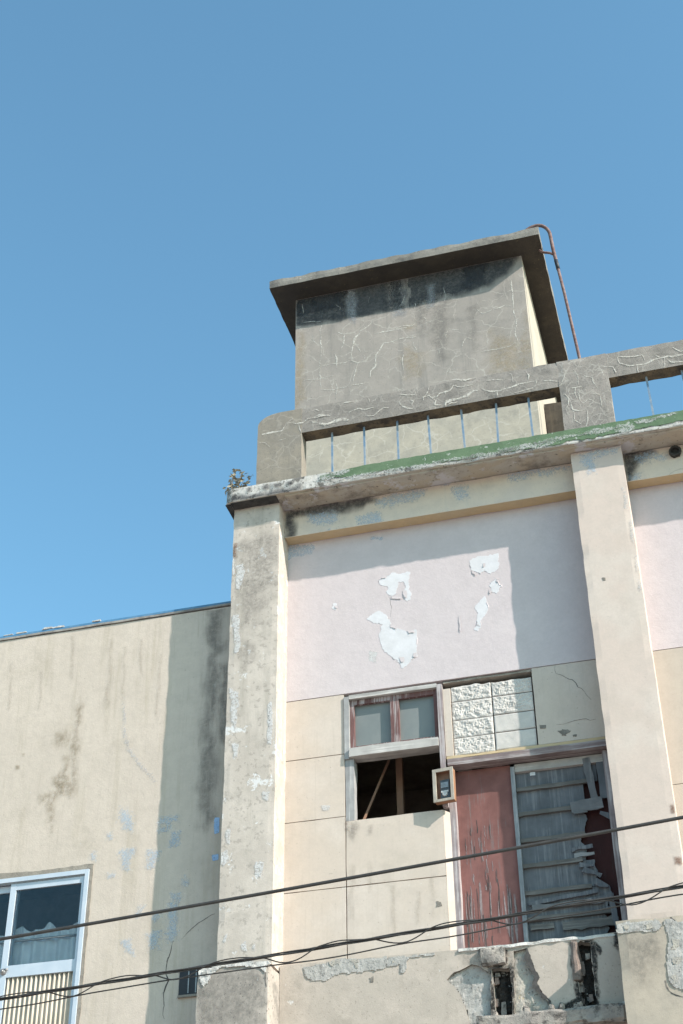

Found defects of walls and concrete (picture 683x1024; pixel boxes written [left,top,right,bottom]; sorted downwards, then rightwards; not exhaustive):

damp [296,257,516,325]
crack [259,279,683,443]
damp [624,450,652,481]
peeling [378,571,412,601]
peeling [469,553,503,631]
peeling [367,611,418,668]
peeling [229,688,239,726]
peeling [212,817,231,866]
flaking render [448,820,550,1024]
flaking render [303,952,435,982]
spalling [579,945,597,1006]
flaking render [616,919,683,990]